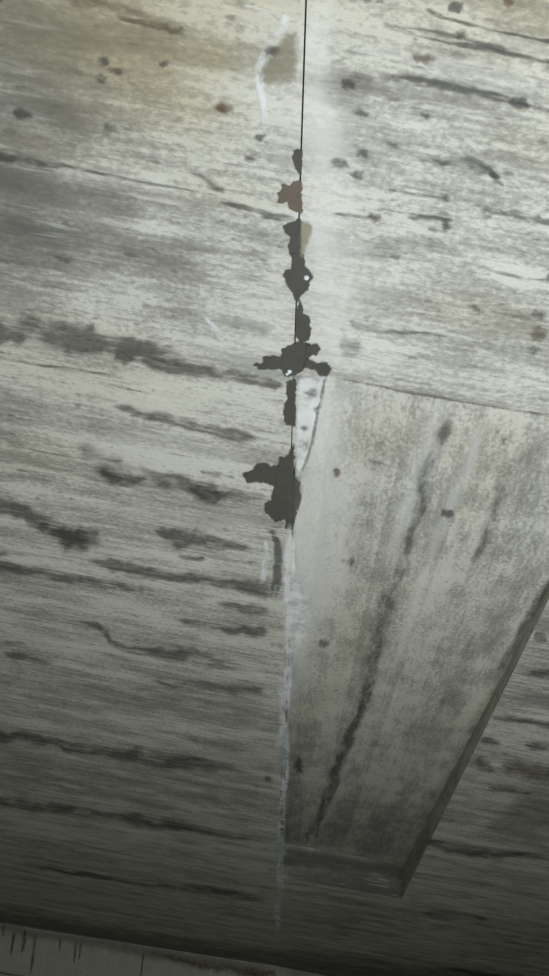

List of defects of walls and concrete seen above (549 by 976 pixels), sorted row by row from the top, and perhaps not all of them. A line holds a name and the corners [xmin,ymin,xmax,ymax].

crack [301,0,309,76]
damp [0,321,221,378]
damp [0,554,34,574]
damp [93,149,332,931]
damp [0,732,139,760]
damp [332,685,370,786]